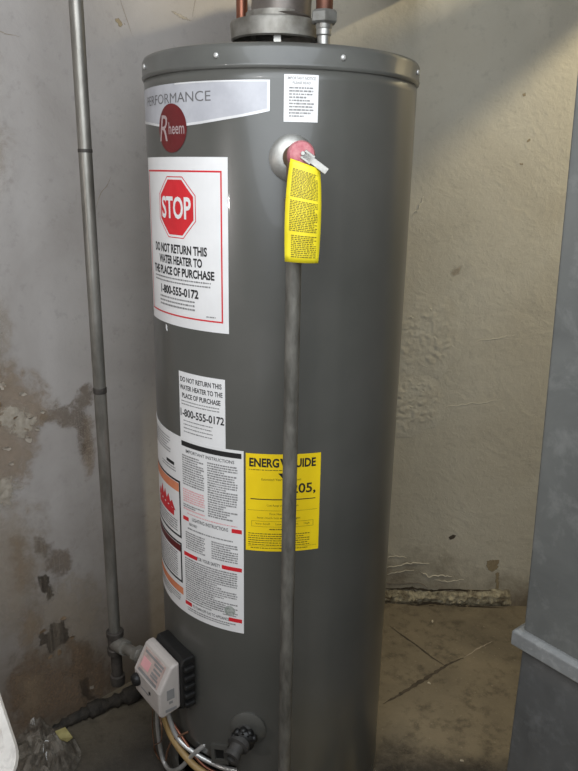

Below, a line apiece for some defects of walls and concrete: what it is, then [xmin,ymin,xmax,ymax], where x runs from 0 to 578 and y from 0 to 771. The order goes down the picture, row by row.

damp [40,384,93,465]
flaking render [38,574,53,600]
flaking render [385,556,511,606]
flaking render [39,616,75,659]
crack [383,626,491,704]